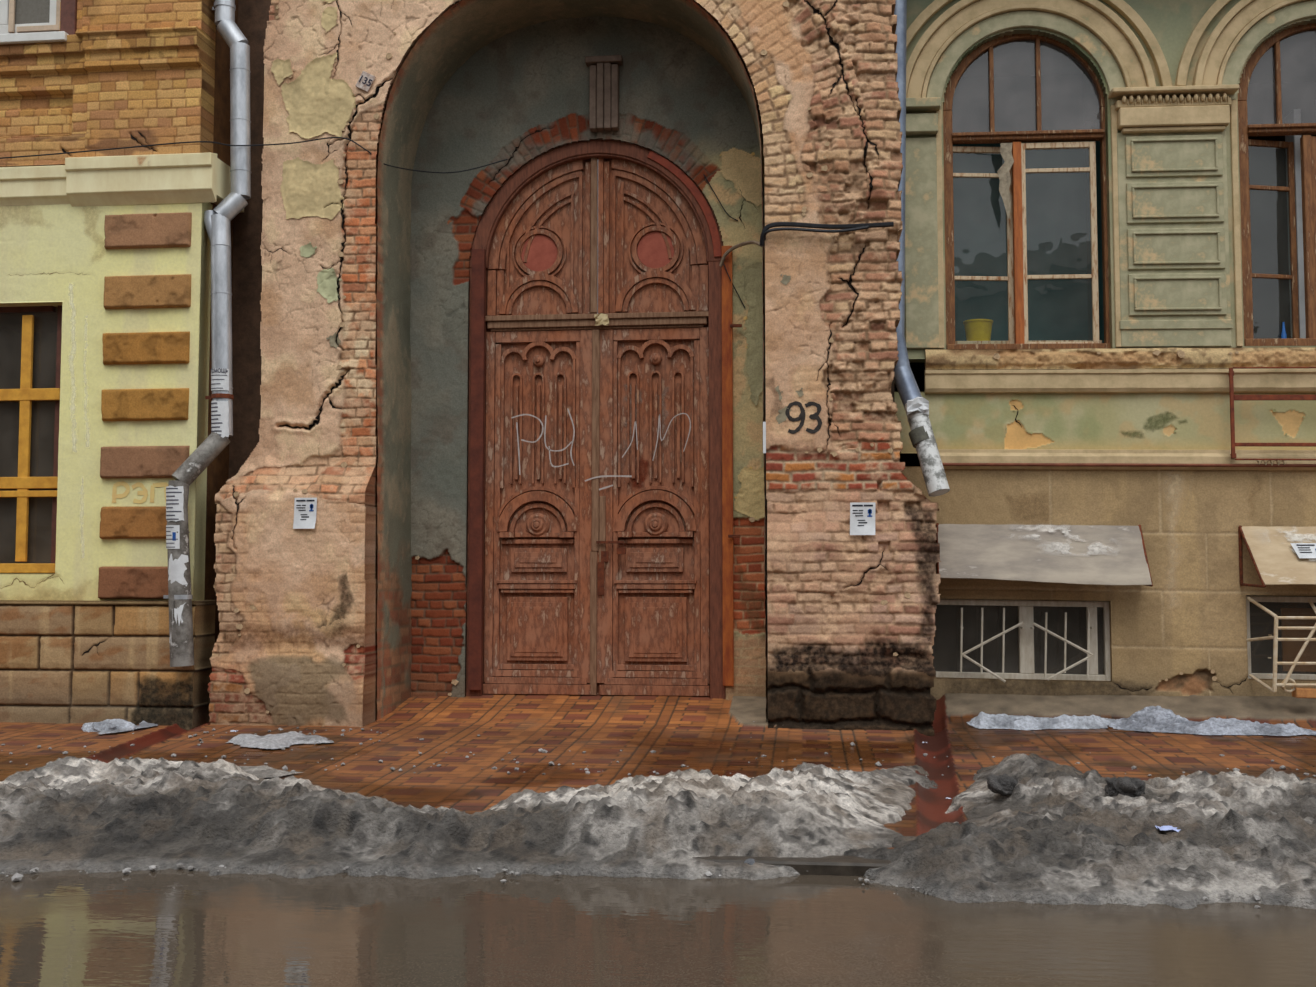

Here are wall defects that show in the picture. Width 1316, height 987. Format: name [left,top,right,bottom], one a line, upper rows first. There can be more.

crack [280,0,398,430]
crack [489,128,551,182]
crack [804,0,879,207]
spalling [207,53,387,726]
spalling [693,0,941,736]
peeling [1004,398,1054,449]
spalling [411,550,467,697]
damp [768,507,940,736]
damp [953,679,1141,696]